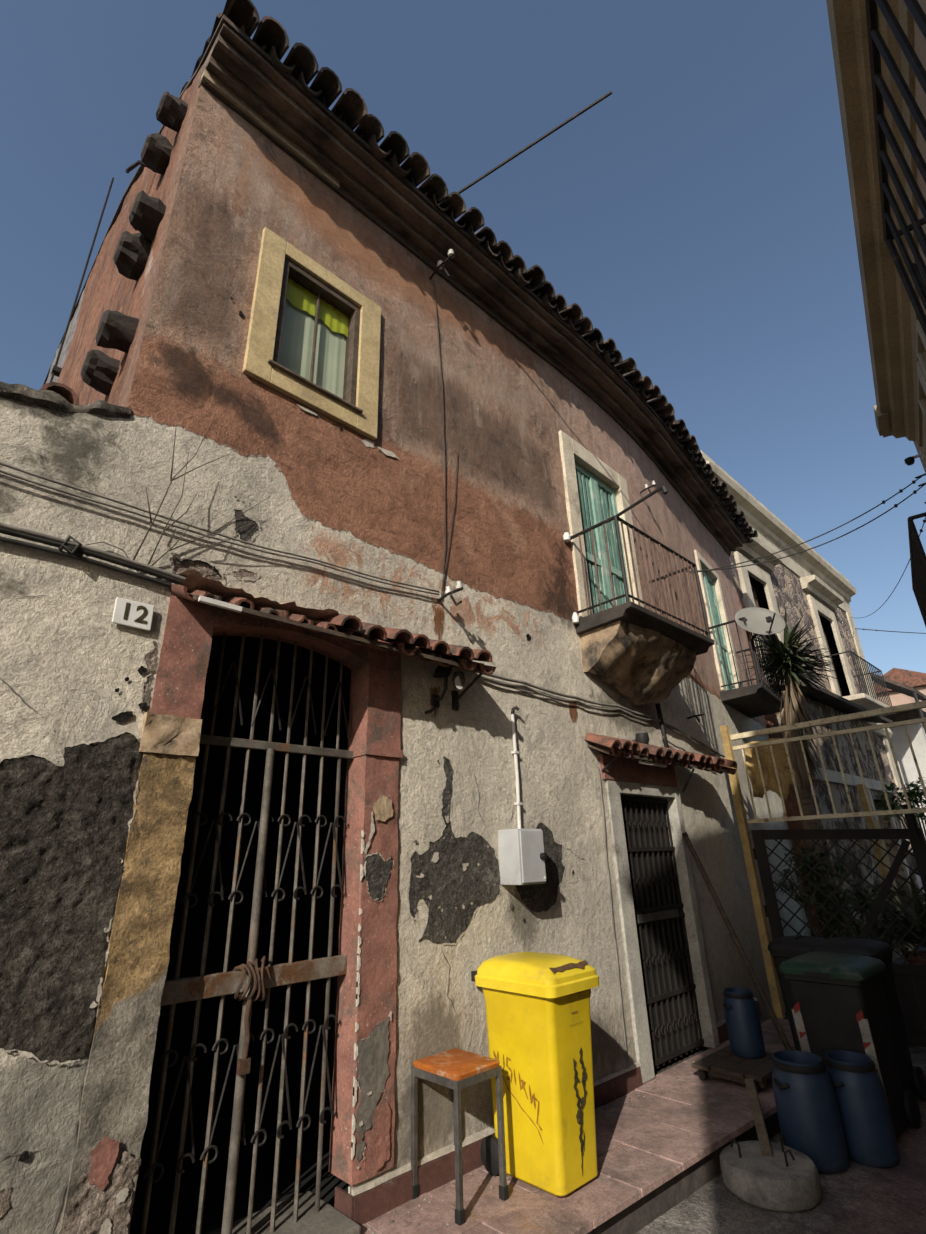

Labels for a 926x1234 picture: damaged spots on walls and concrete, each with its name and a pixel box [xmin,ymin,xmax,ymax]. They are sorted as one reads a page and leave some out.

water stain [163,347,278,441]
spalling [362,439,399,459]
spalling [169,551,260,582]
flaking render [232,496,261,542]
flaking render [0,639,160,1065]
peeling [356,795,394,1007]
flaking render [409,755,574,945]
peeling [351,1011,392,1171]
spalling [59,1136,141,1234]